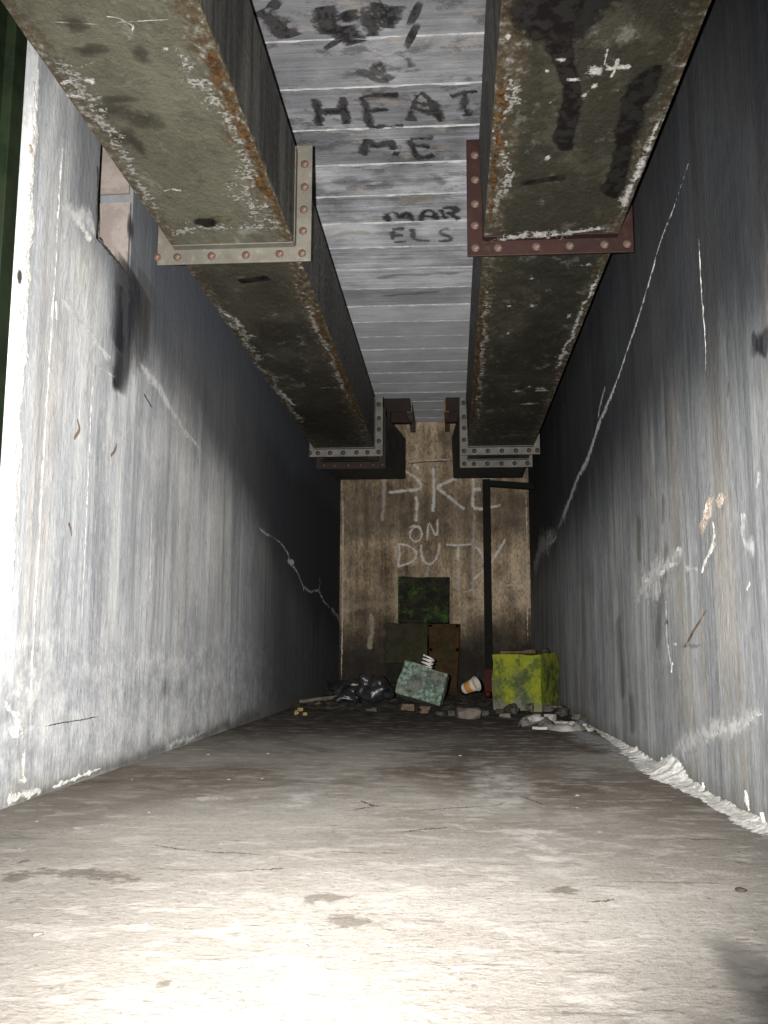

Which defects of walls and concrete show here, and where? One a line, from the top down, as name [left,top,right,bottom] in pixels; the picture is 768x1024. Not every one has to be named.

rust [205,37,285,226]
crack [260,529,339,621]
damp [7,768,101,806]
damp [575,712,768,837]